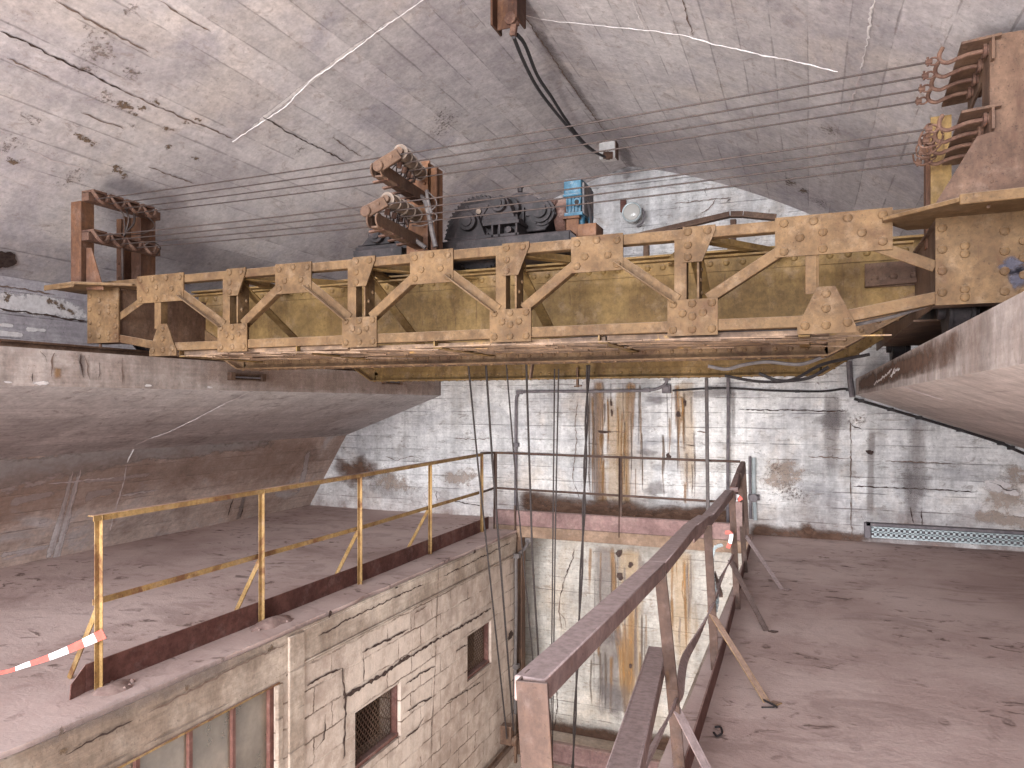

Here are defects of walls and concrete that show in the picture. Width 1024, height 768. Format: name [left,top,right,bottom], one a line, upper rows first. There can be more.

crack [0,0,423,162]
crack [526,0,875,128]
leakage [336,457,375,485]
rust [588,384,643,501]
rust [589,550,616,592]
crack [308,542,511,761]
rust [590,607,645,711]